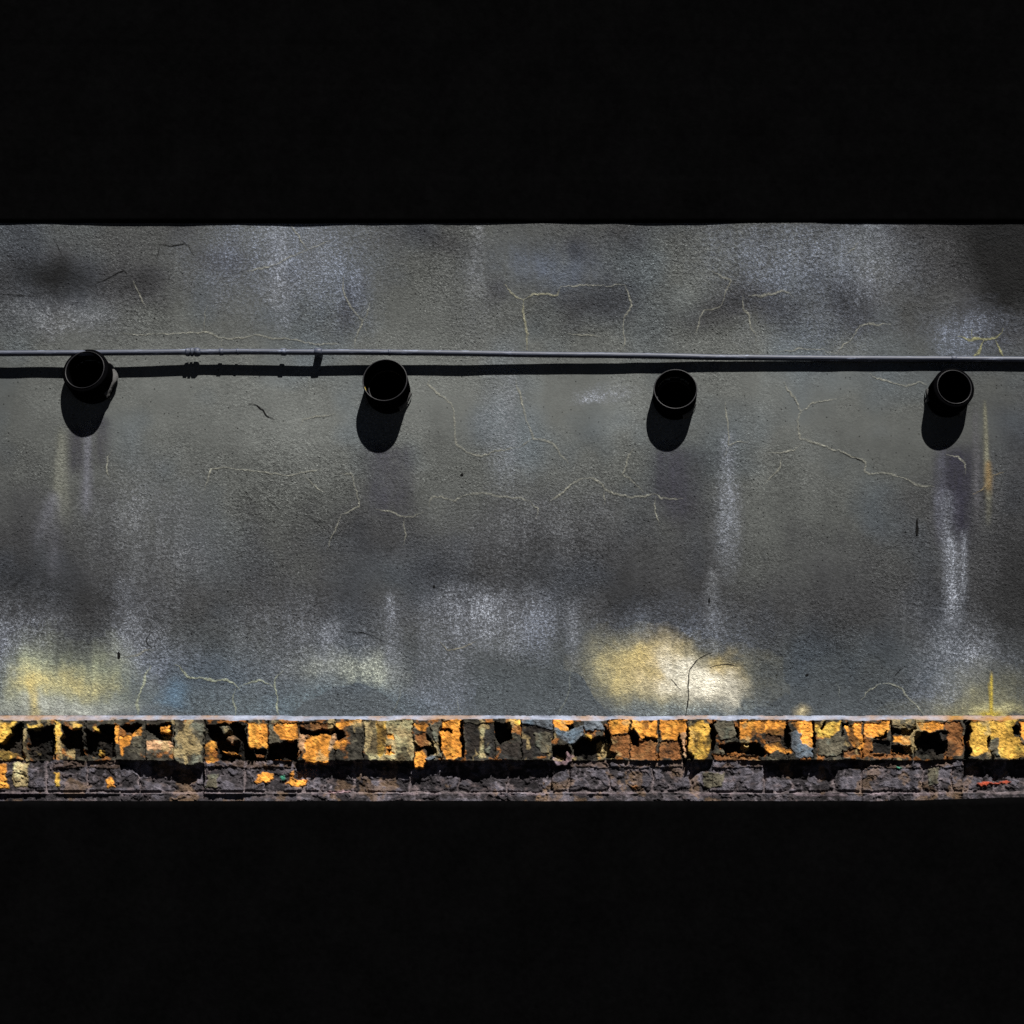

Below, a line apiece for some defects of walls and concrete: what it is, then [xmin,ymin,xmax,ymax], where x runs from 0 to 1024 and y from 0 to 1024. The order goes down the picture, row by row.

crack [509,284,632,344]
crack [770,433,913,483]
water stain [946,452,968,613]
water stain [600,639,737,715]
spalling [0,719,1024,789]